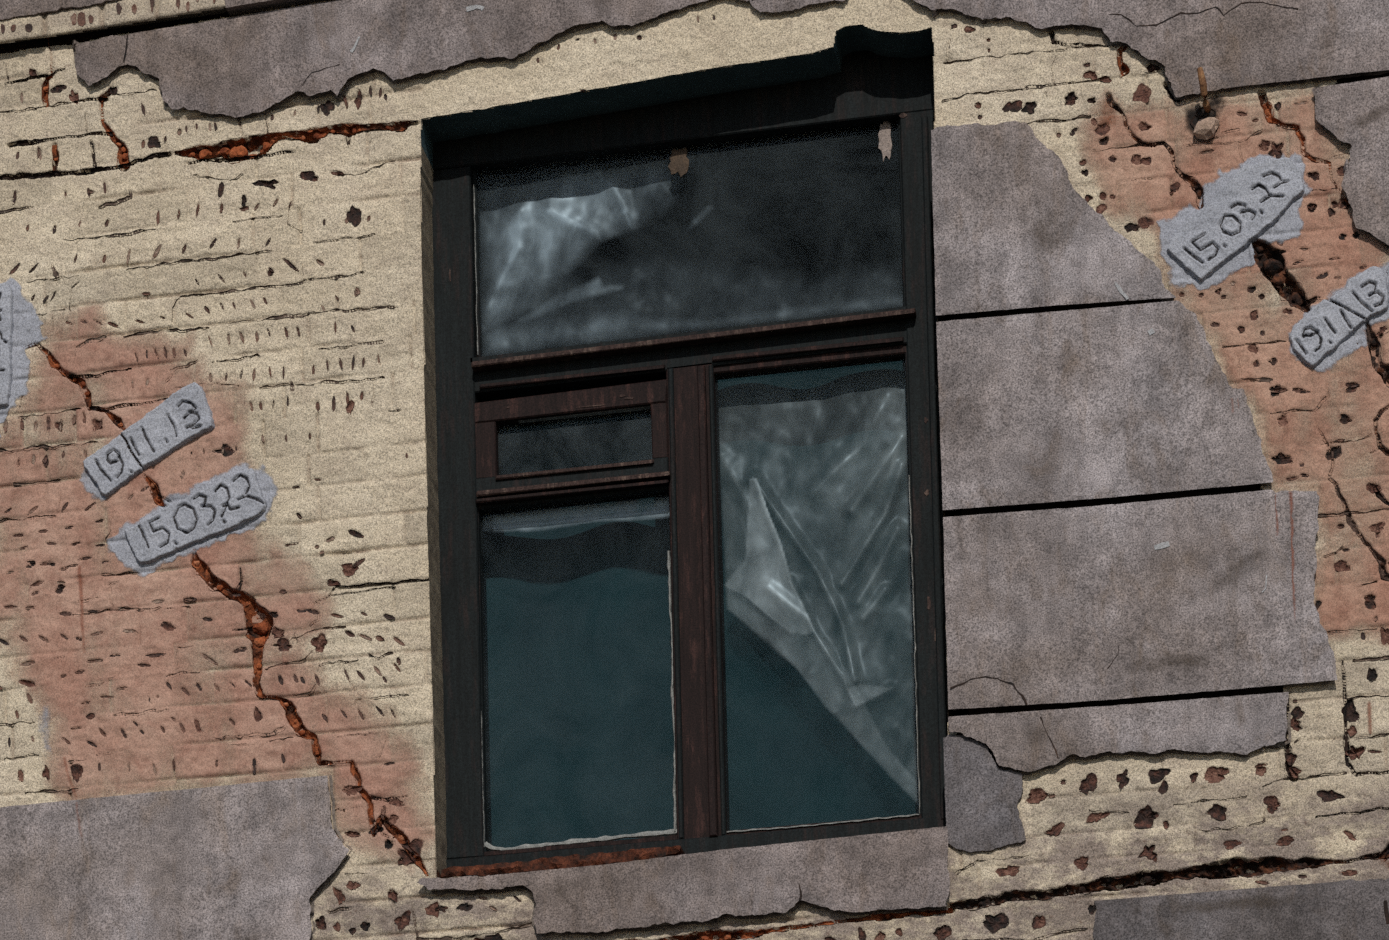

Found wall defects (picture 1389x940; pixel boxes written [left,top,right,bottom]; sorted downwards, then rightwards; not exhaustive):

peeling [1259,130,1295,159]
spalling [1306,125,1353,218]
crack [0,34,418,523]
spalling [1237,241,1341,367]
spalling [82,371,114,431]
spalling [1244,353,1385,574]
spalling [0,498,109,594]
crack [659,240,1389,940]
peeling [1364,594,1376,610]
crack [4,721,108,793]
crack [67,549,429,876]
crack [412,908,532,940]